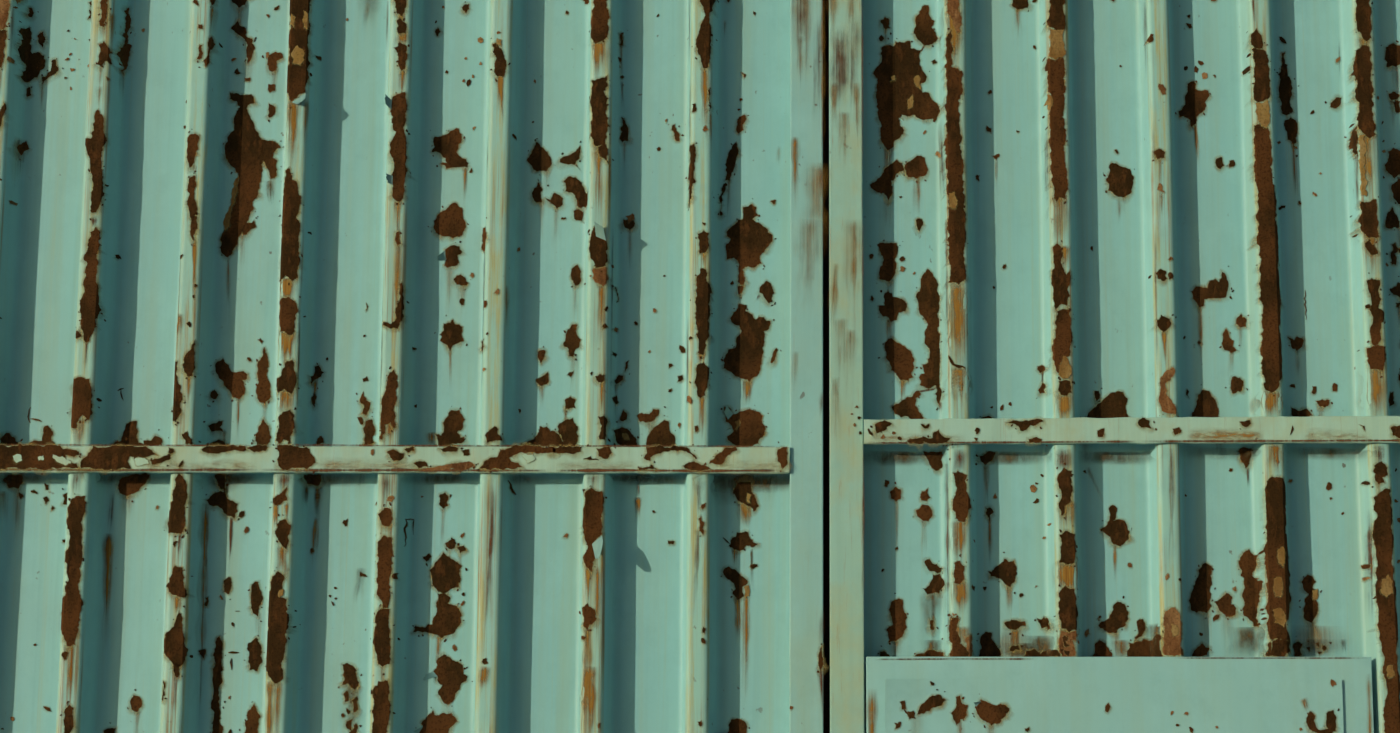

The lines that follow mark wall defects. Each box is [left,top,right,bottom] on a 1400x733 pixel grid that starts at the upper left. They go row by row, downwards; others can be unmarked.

rust [0,0,789,733]
rust [818,0,1400,733]